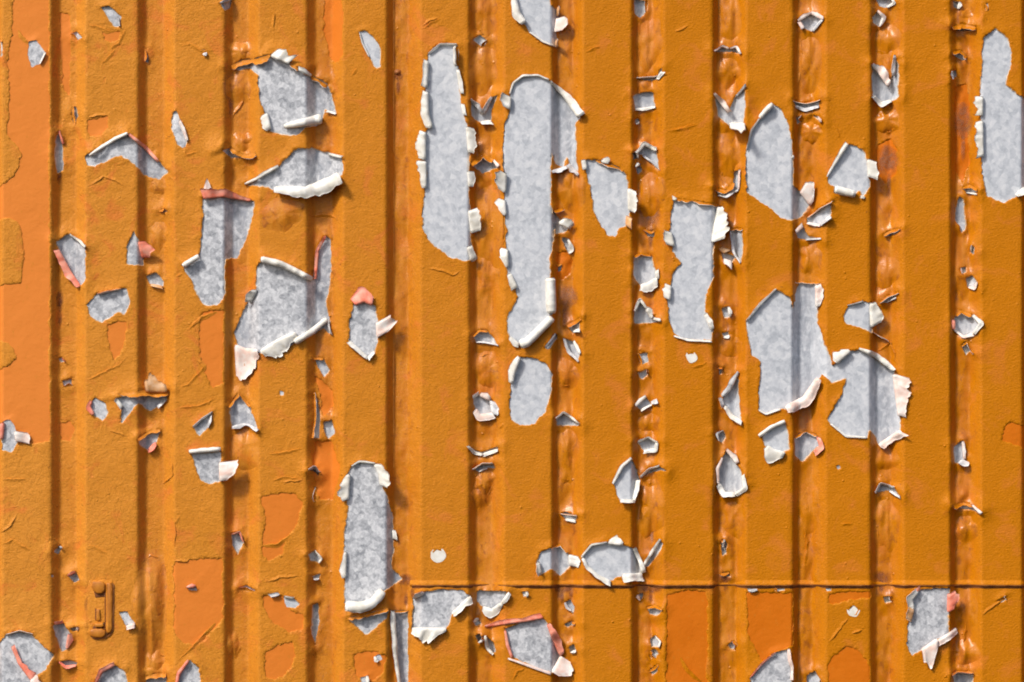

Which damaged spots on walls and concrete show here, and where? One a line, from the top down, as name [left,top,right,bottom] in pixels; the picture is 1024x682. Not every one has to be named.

peeling [85,132,167,179]
peeling [182,148,343,432]
peeling [231,49,336,135]
peeling [415,43,898,426]
peeling [746,281,911,464]
peeling [951,24,1024,232]
peeling [261,357,577,682]
peeling [536,535,708,682]
peeling [906,585,960,669]